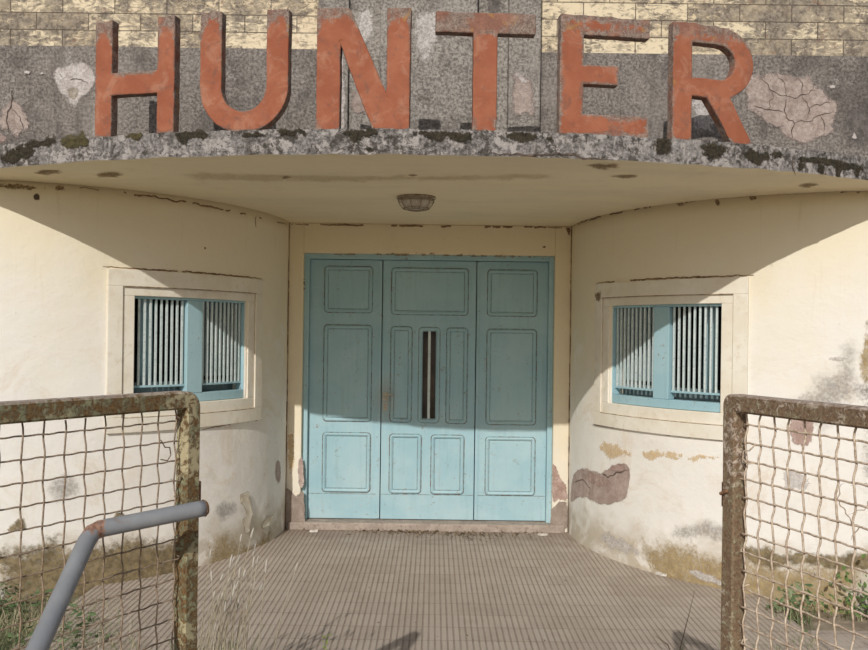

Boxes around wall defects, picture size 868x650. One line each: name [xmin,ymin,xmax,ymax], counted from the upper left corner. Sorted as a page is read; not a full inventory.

spalling [24,62,95,106]
spalling [0,90,29,137]
water stain [798,156,864,177]
water stain [860,339,868,394]
peeling [643,450,718,461]
spalling [276,434,318,532]
spalling [538,442,631,536]